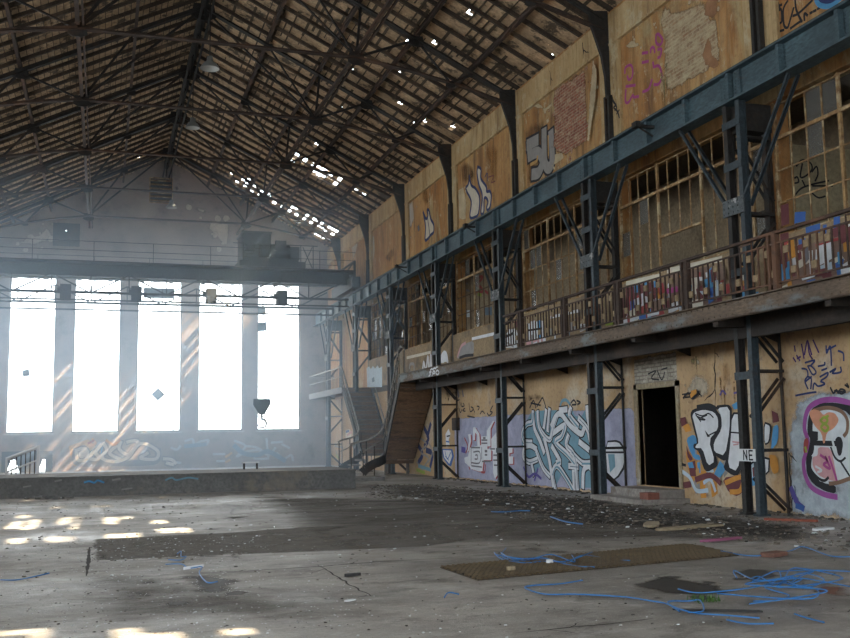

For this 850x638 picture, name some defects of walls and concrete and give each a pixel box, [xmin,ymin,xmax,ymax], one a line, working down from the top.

spalling [653,0,720,89]
peeling [586,61,598,141]
crack [197,556,441,597]